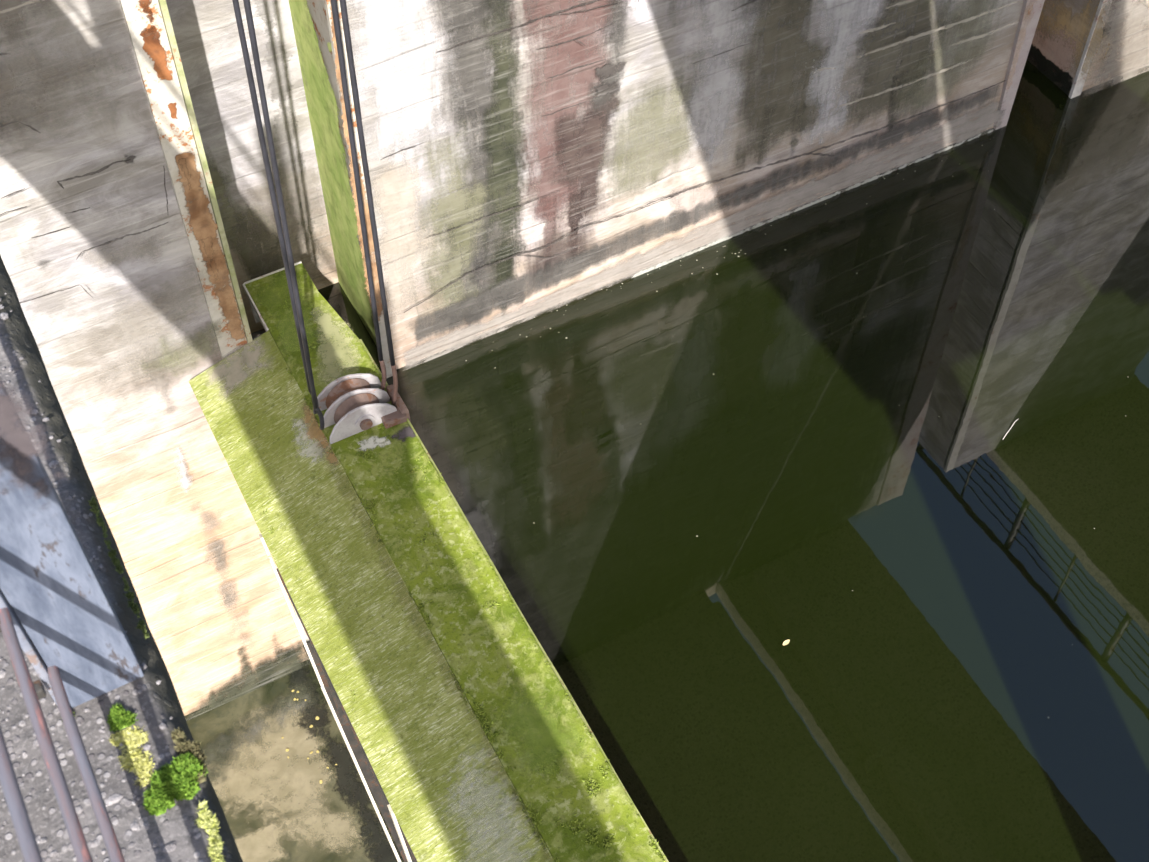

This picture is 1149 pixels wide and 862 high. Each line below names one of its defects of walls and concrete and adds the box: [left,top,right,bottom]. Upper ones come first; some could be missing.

rust [138,0,173,80]
rust [168,103,177,119]
crack [0,188,27,215]
crack [20,159,168,304]
rust [175,152,245,340]
leakage [353,0,1003,367]
rust [0,382,49,495]